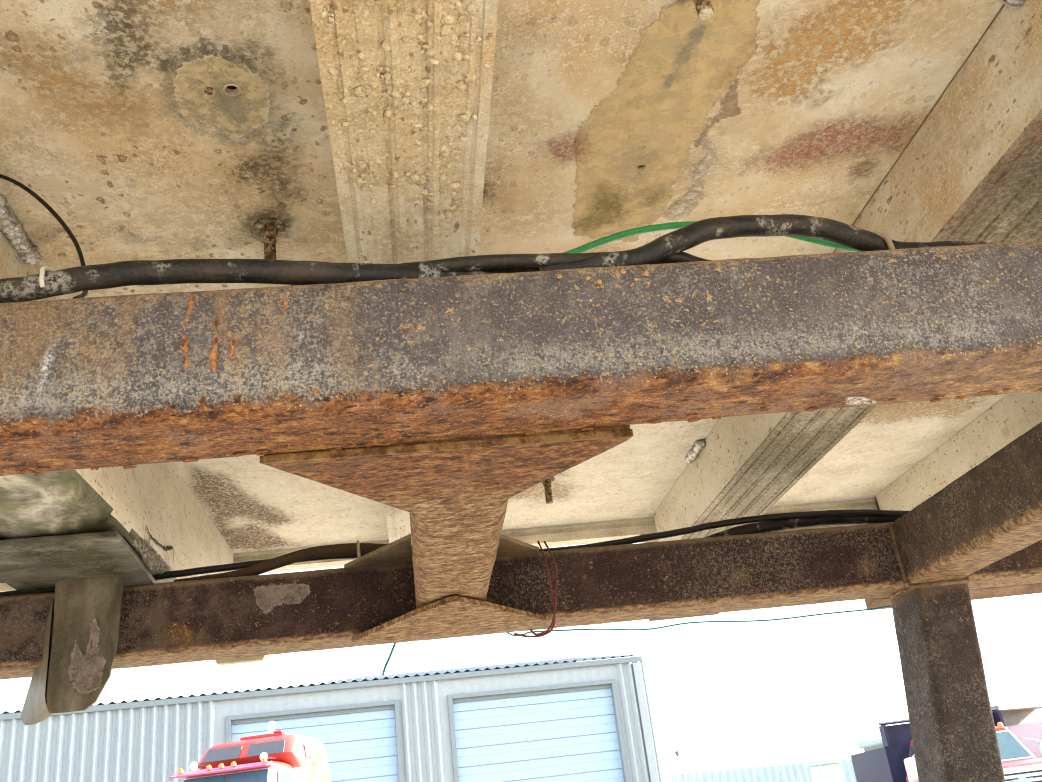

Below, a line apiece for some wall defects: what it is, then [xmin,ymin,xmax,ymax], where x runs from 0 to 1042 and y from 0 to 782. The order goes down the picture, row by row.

rust [748,0,911,99]
water stain [95,5,299,199]
water stain [571,0,761,242]
rust [586,270,649,288]
rust [181,336,189,371]
rust [208,320,236,371]
rust [859,397,977,424]
water stain [509,473,572,499]
peeling [253,583,310,614]
peeling [67,617,106,694]